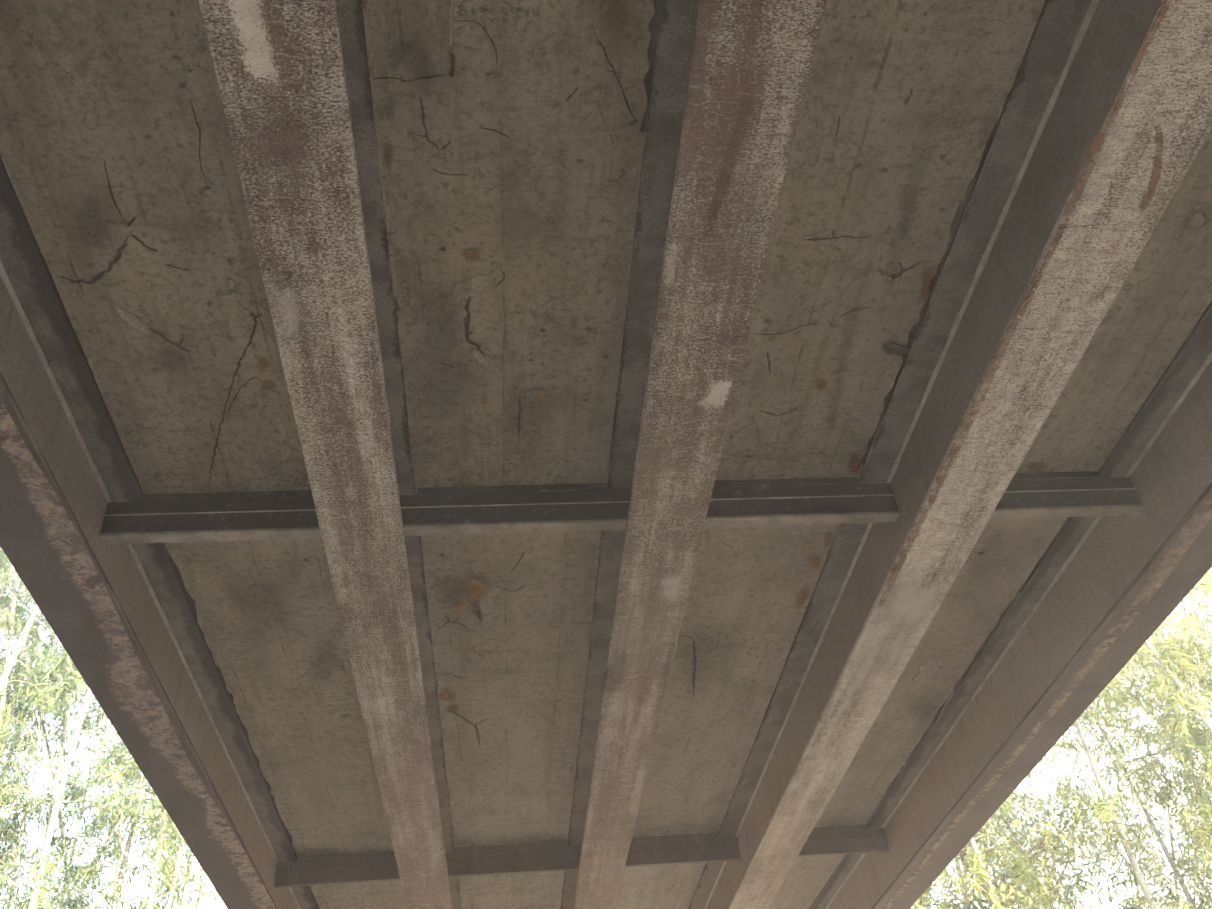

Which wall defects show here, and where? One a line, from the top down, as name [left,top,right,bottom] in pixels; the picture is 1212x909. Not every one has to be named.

crack [373,75,469,176]
crack [594,35,637,182]
crack [56,161,190,284]
crack [441,270,505,368]
corrosion [879,0,1170,606]
crack [209,299,265,489]
crack [442,551,529,629]
peeling [0,404,293,909]
crack [445,709,486,747]